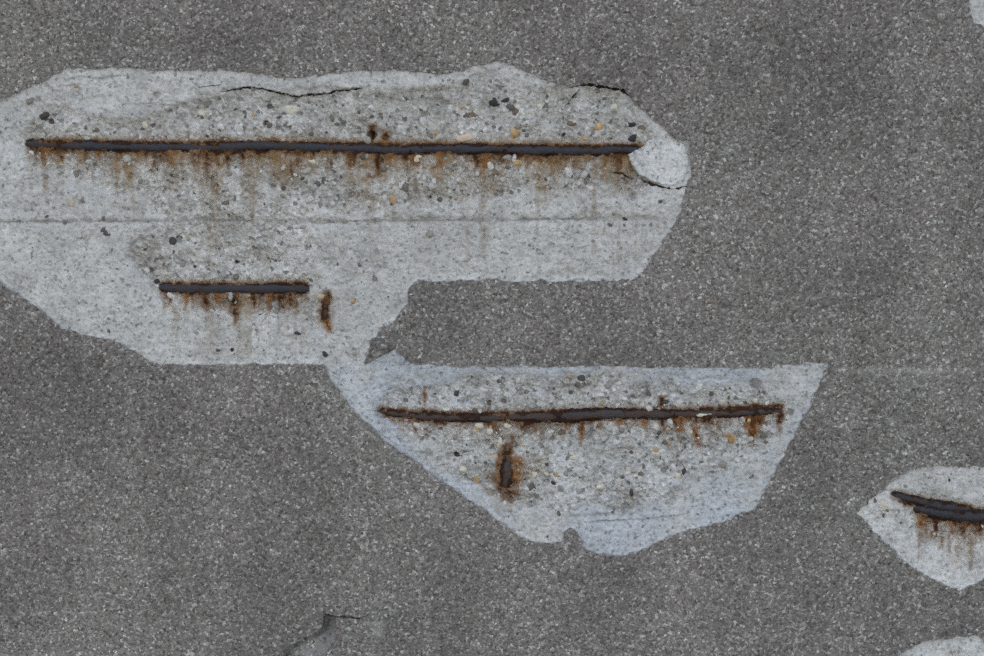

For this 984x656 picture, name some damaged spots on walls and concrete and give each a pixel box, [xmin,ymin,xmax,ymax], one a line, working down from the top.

spalling [969,0,984,27]
corrosion [28,124,643,190]
corrosion [160,281,308,323]
corrosion [319,290,332,332]
spalling [0,60,830,556]
corrosion [377,389,567,499]
corrosion [565,409,601,437]
corrosion [617,395,785,443]
spalling [856,465,984,592]
corrosion [895,491,984,546]
spalling [282,613,347,656]
spalling [898,635,984,656]